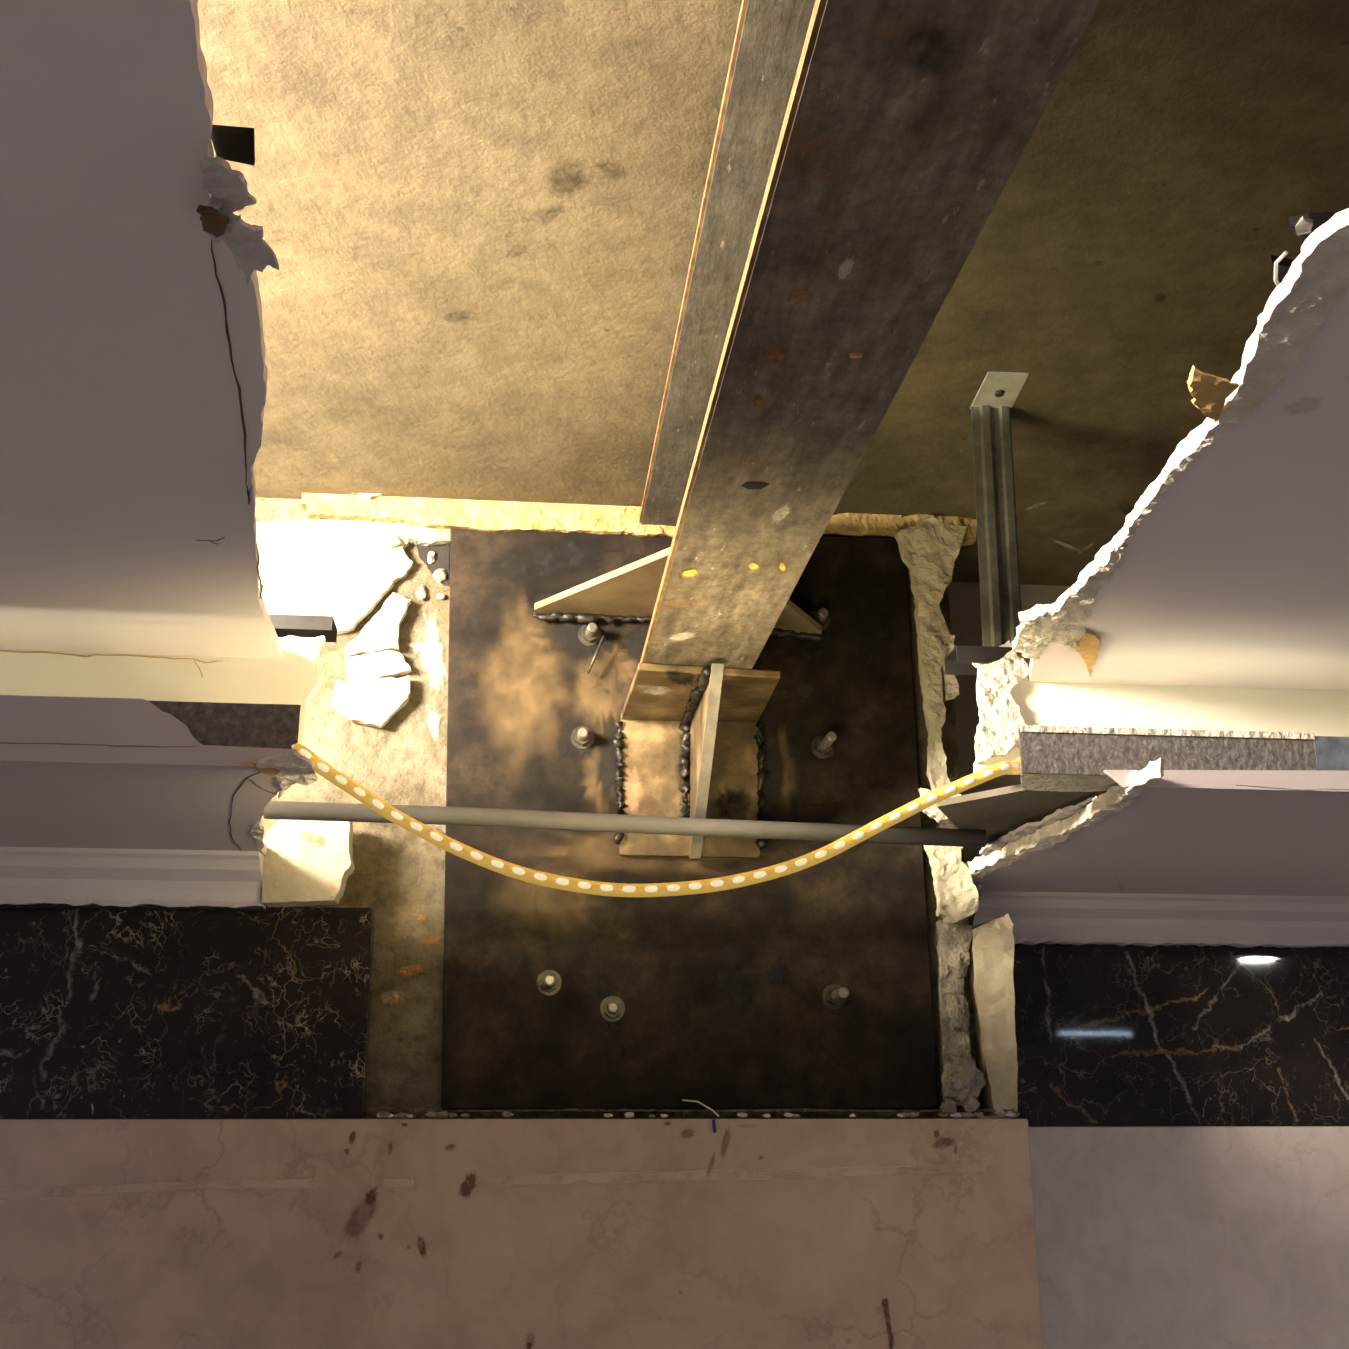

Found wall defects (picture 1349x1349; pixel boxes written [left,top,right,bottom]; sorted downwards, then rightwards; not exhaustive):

flaking render [241,208,1349,1115]